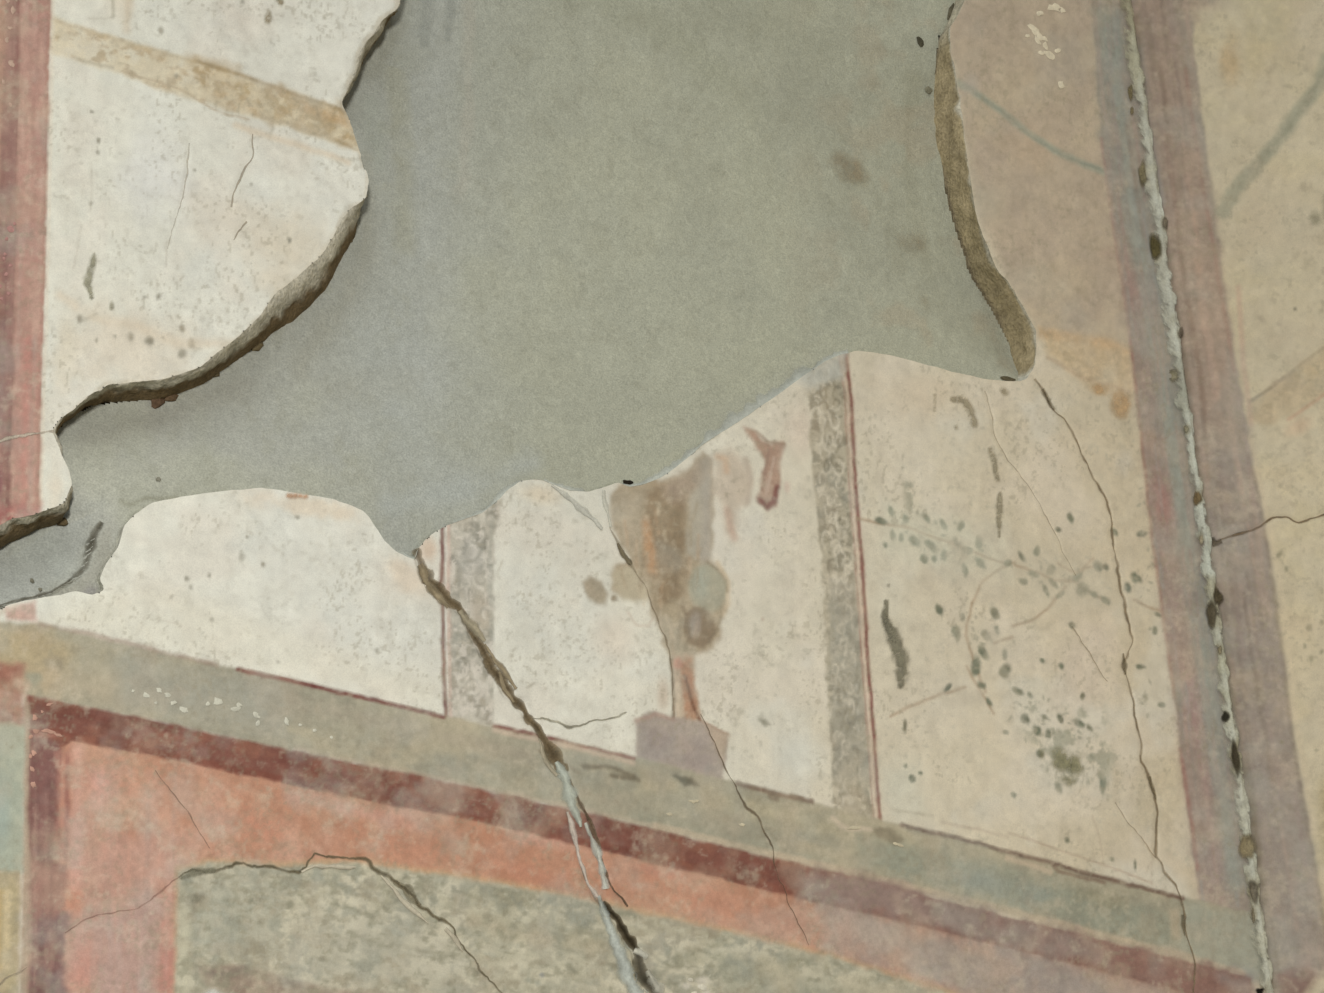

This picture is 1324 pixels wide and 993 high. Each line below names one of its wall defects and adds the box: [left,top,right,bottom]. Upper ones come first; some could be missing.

crack [155,770,502,993]
flaking render [0,0,1036,610]
crack [413,548,664,993]
crack [1038,383,1196,993]
crack [1122,0,1324,993]